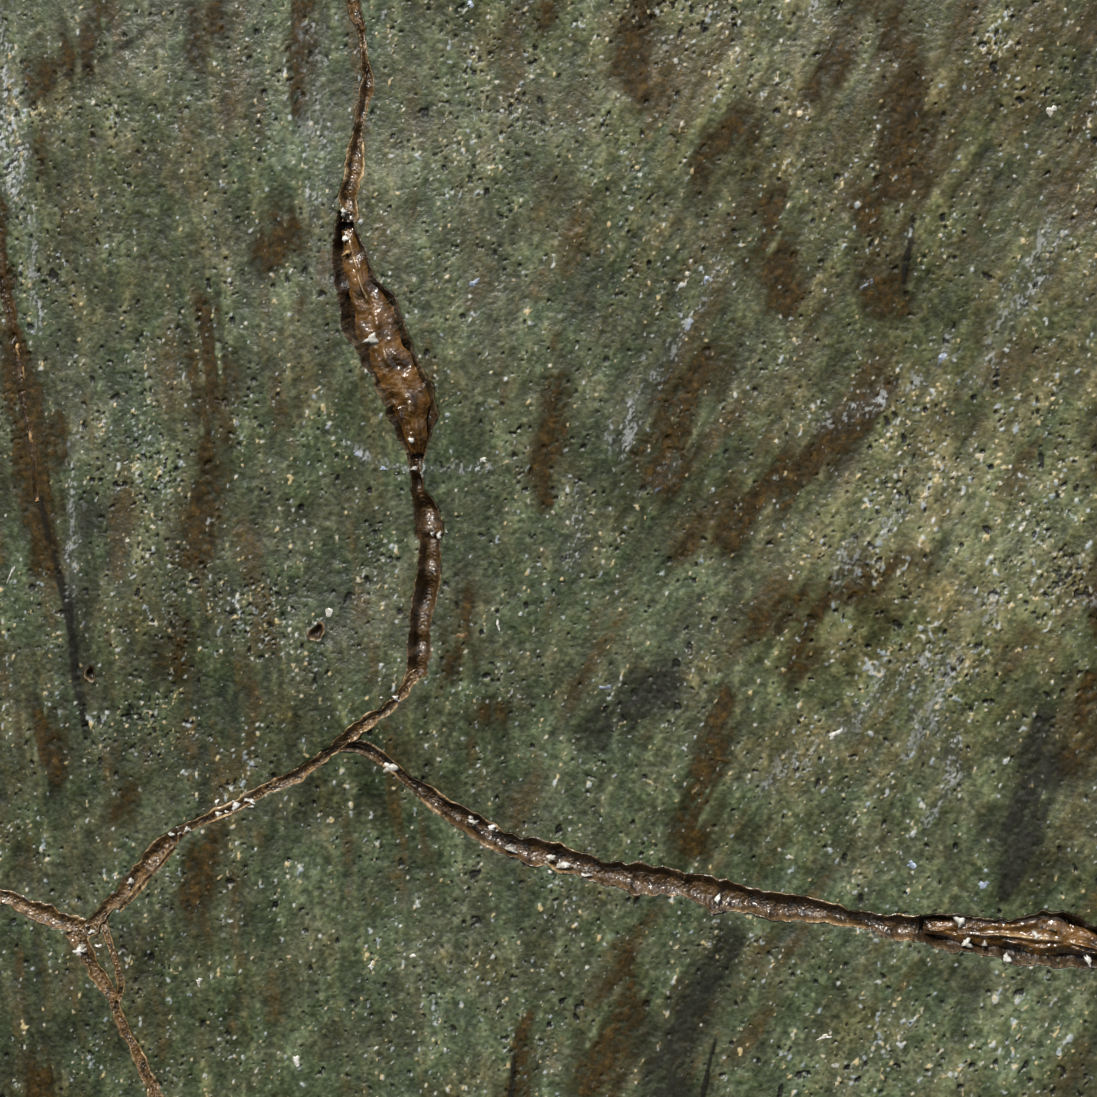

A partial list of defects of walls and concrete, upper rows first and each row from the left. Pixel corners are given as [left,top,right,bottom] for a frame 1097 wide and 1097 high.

crack [40,19,158,89]
crack [332,0,375,222]
crack [901,215,914,282]
crack [0,213,86,730]
crack [0,459,920,1097]